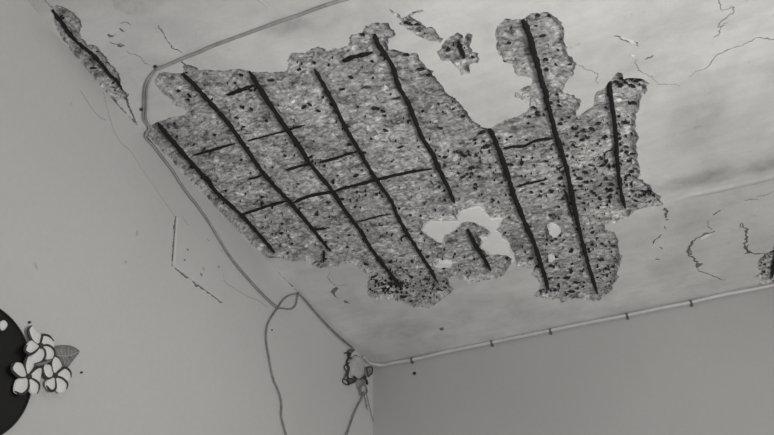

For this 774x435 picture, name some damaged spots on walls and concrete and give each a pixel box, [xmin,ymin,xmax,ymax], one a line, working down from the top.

spalling [50,5,131,109]
crack [615,0,774,86]
spalling [147,9,663,308]
crack [686,210,722,280]
crack [740,223,763,254]
spalling [755,247,774,285]